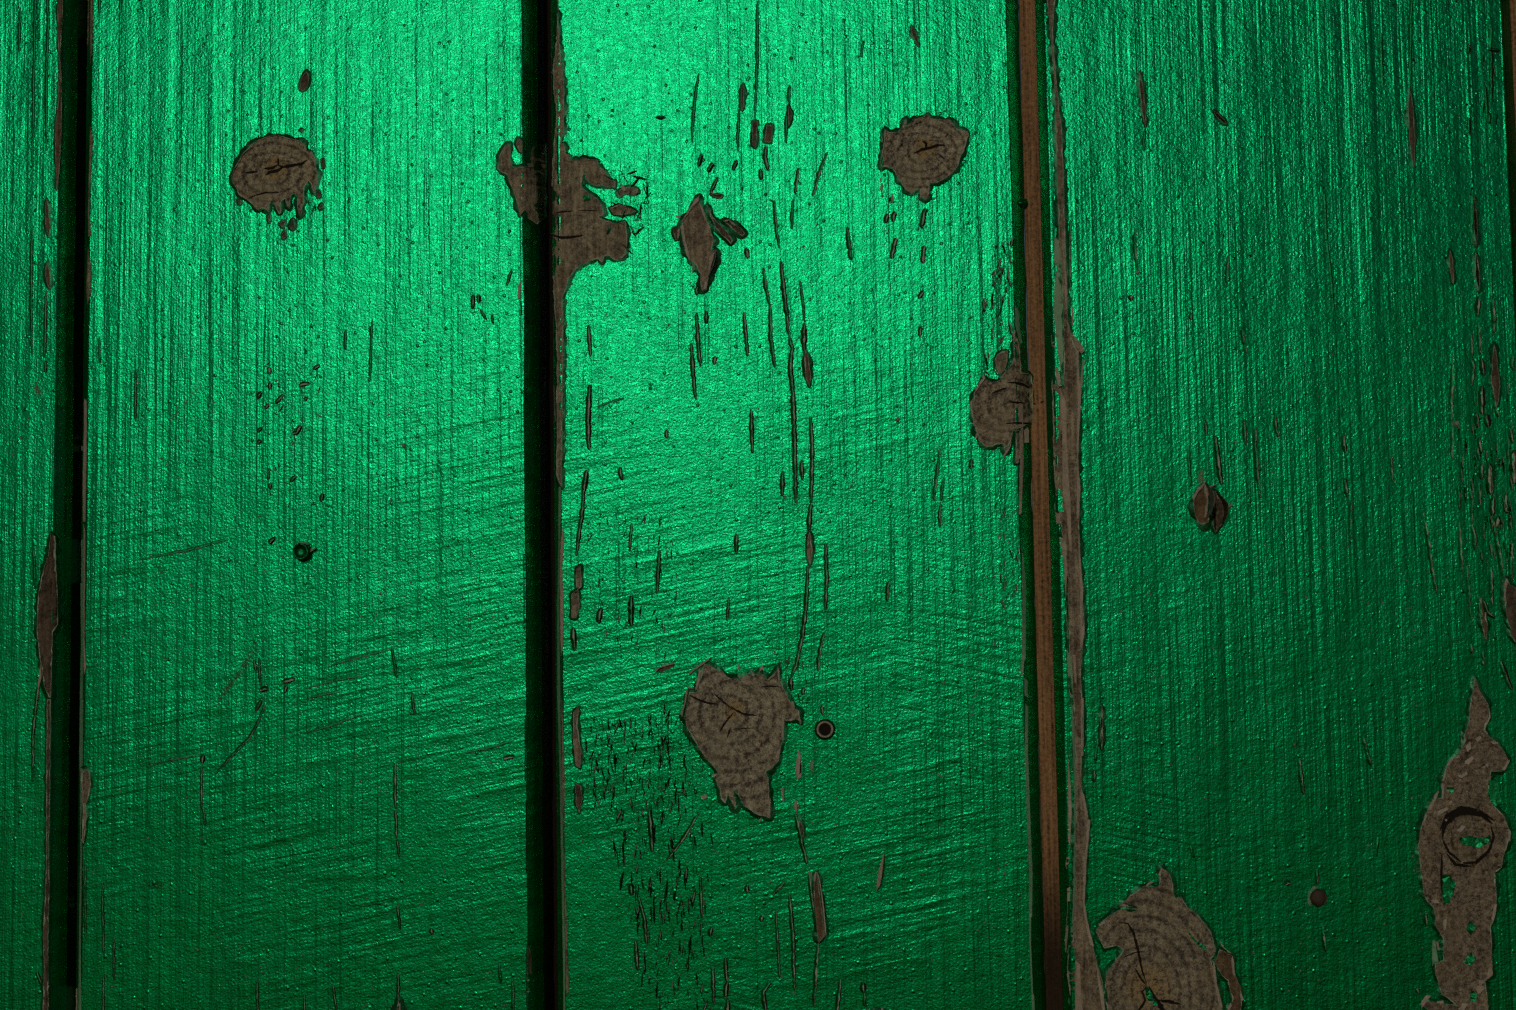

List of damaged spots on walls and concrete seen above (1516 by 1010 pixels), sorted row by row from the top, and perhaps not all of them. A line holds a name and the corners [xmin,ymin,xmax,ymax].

peeling [229,127,326,241]
peeling [877,112,970,204]
peeling [496,0,814,1010]
peeling [805,530,816,567]
peeling [969,0,1245,1010]
peeling [1414,674,1513,1010]